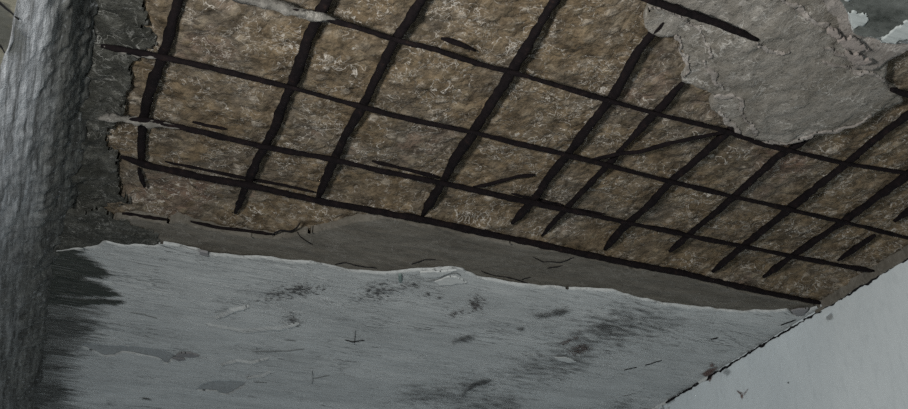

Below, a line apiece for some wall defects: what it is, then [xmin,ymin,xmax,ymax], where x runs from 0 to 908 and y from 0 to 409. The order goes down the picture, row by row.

spalling [53,0,908,320]